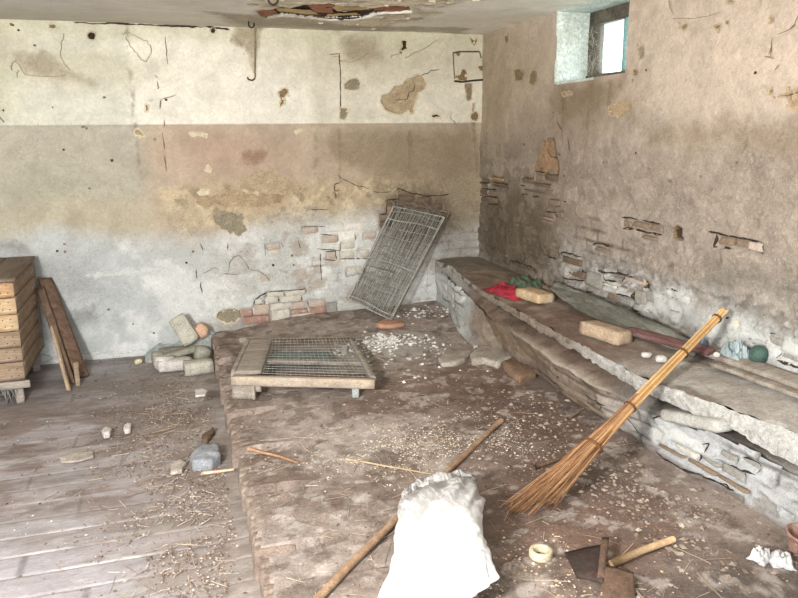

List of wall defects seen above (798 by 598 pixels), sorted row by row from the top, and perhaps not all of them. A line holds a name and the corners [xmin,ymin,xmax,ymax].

peeling [246,0,479,30]
crack [765,16,798,69]
crack [74,22,230,171]
crack [329,53,341,107]
peeling [380,70,434,115]
peeling [767,86,798,112]
peeling [521,137,567,221]
crack [264,175,449,292]
flaking render [364,196,446,239]
flaking render [622,217,684,241]
flaking render [709,231,764,254]
flaking render [215,289,337,327]